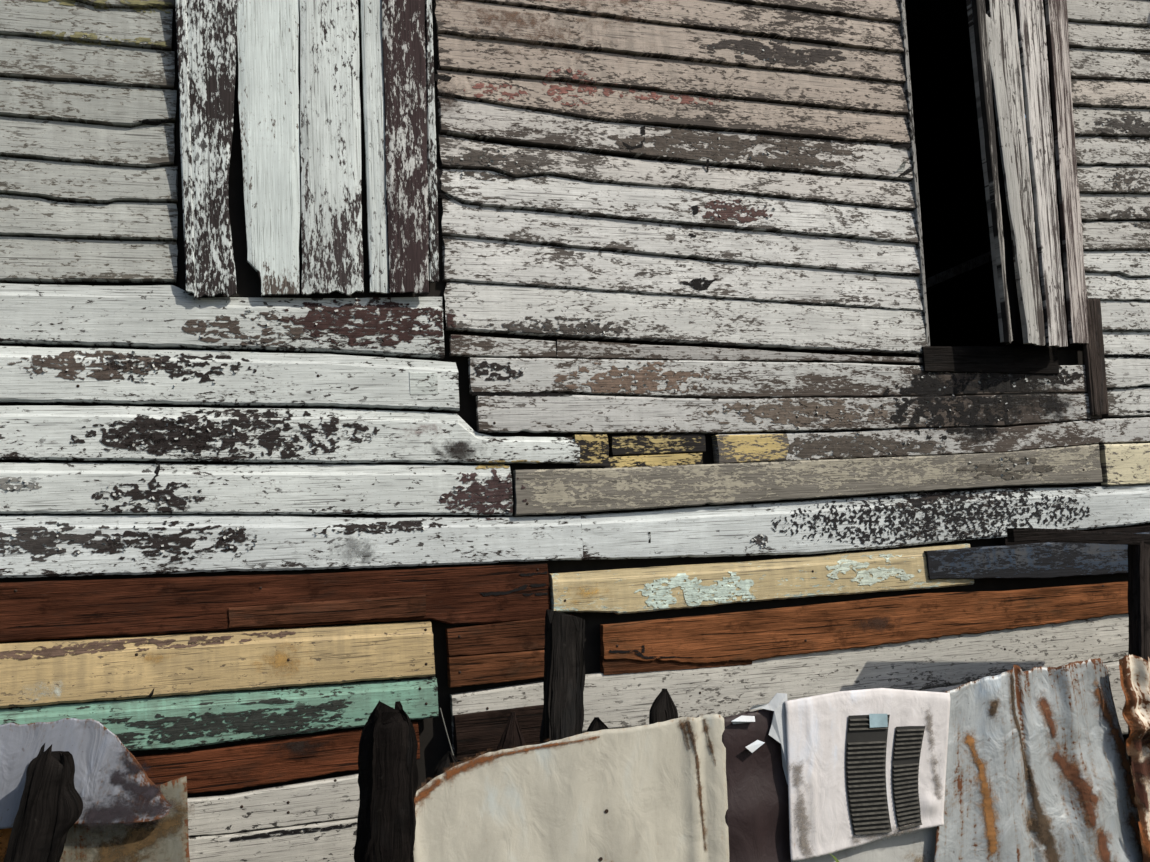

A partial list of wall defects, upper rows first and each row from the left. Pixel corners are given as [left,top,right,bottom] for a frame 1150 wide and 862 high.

peeling [599,127,864,168]
peeling [7,297,467,386]
peeling [472,361,525,381]
peeling [70,409,380,460]
peeling [0,477,257,562]
peeling [306,521,443,535]
peeling [439,460,540,520]
peeling [634,571,760,610]
corrosion [965,735,998,855]
corrosion [989,675,1061,862]
corrosion [1037,698,1111,862]
corrosion [1095,665,1150,857]